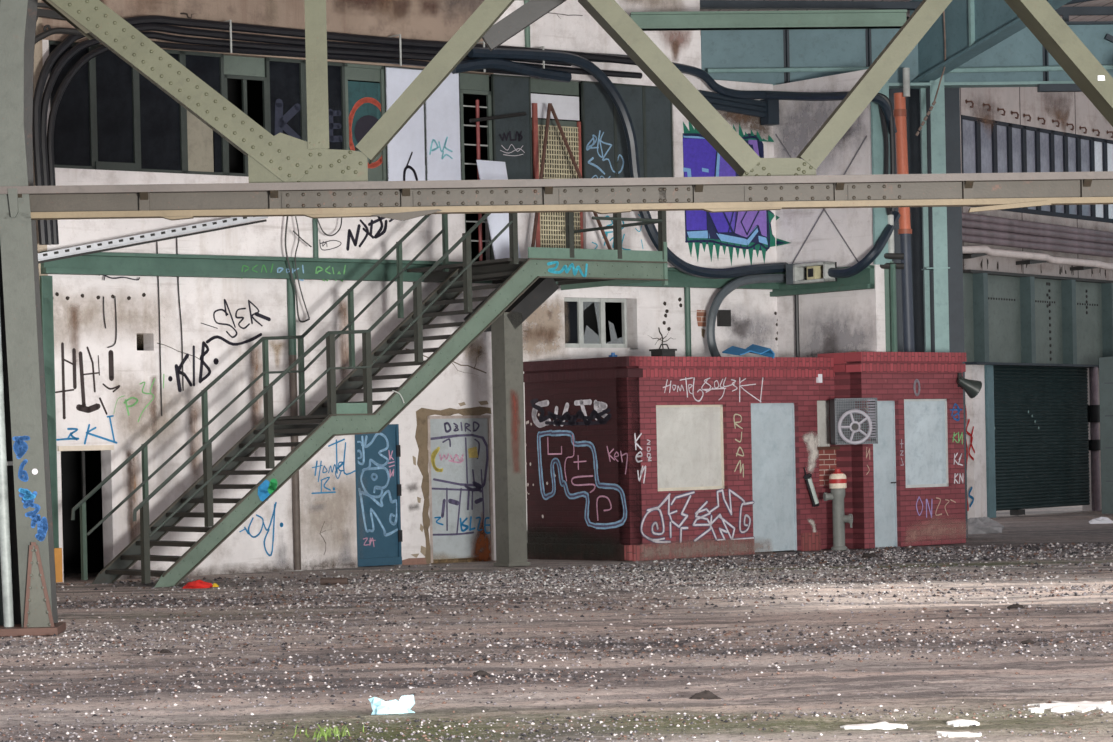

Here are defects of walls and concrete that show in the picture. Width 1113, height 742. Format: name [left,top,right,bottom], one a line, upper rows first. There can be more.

leakage [807,321,865,357]
spalling [402,401,491,565]